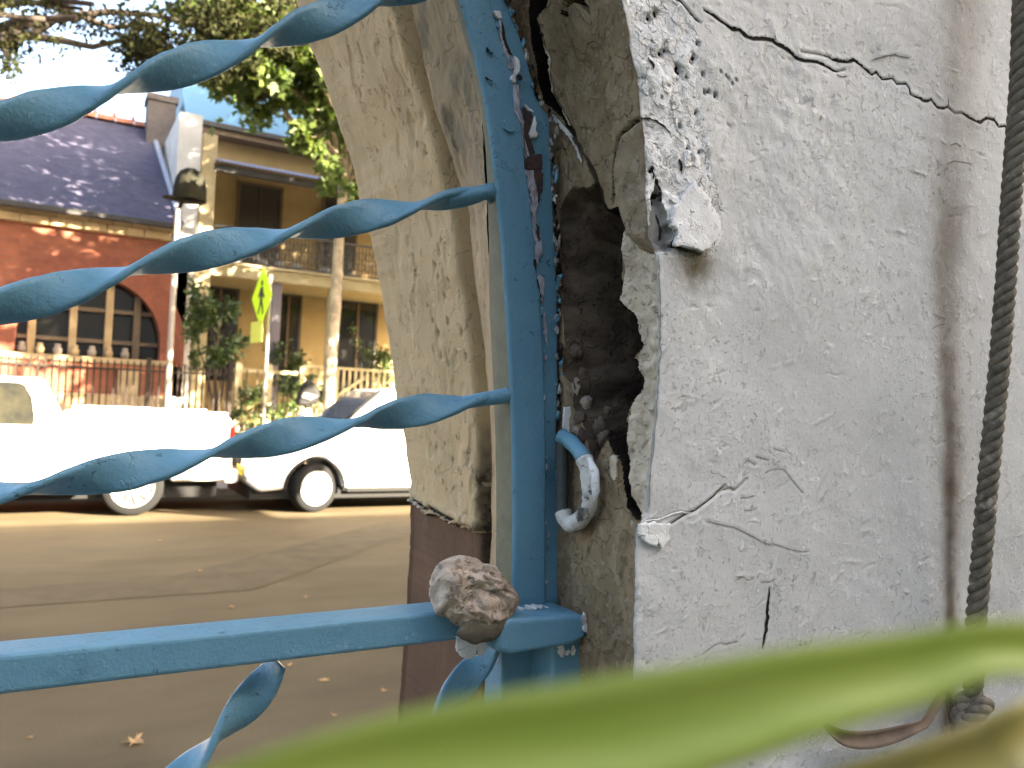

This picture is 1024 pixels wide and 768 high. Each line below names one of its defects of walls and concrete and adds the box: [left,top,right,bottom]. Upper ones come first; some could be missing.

crack [678,0,1006,128]
spalling [486,0,724,520]
crack [637,449,808,552]
crack [702,576,775,655]